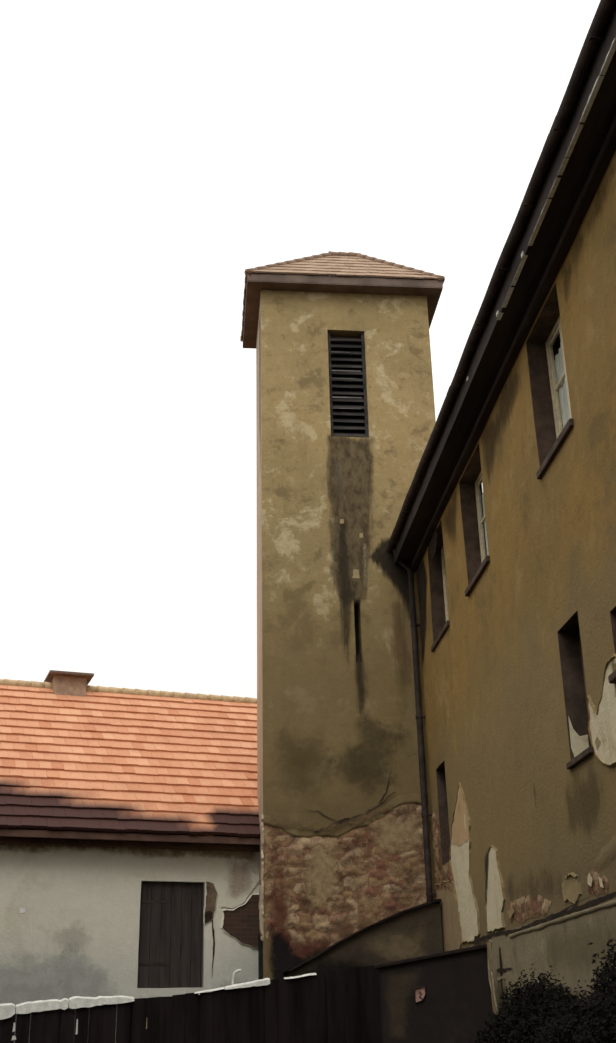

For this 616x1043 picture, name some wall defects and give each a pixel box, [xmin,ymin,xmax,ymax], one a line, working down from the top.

damp [340,523,350,645]
damp [356,655,364,708]
flaking render [568,654,616,769]
crack [302,771,396,833]
spalling [203,782,609,1015]